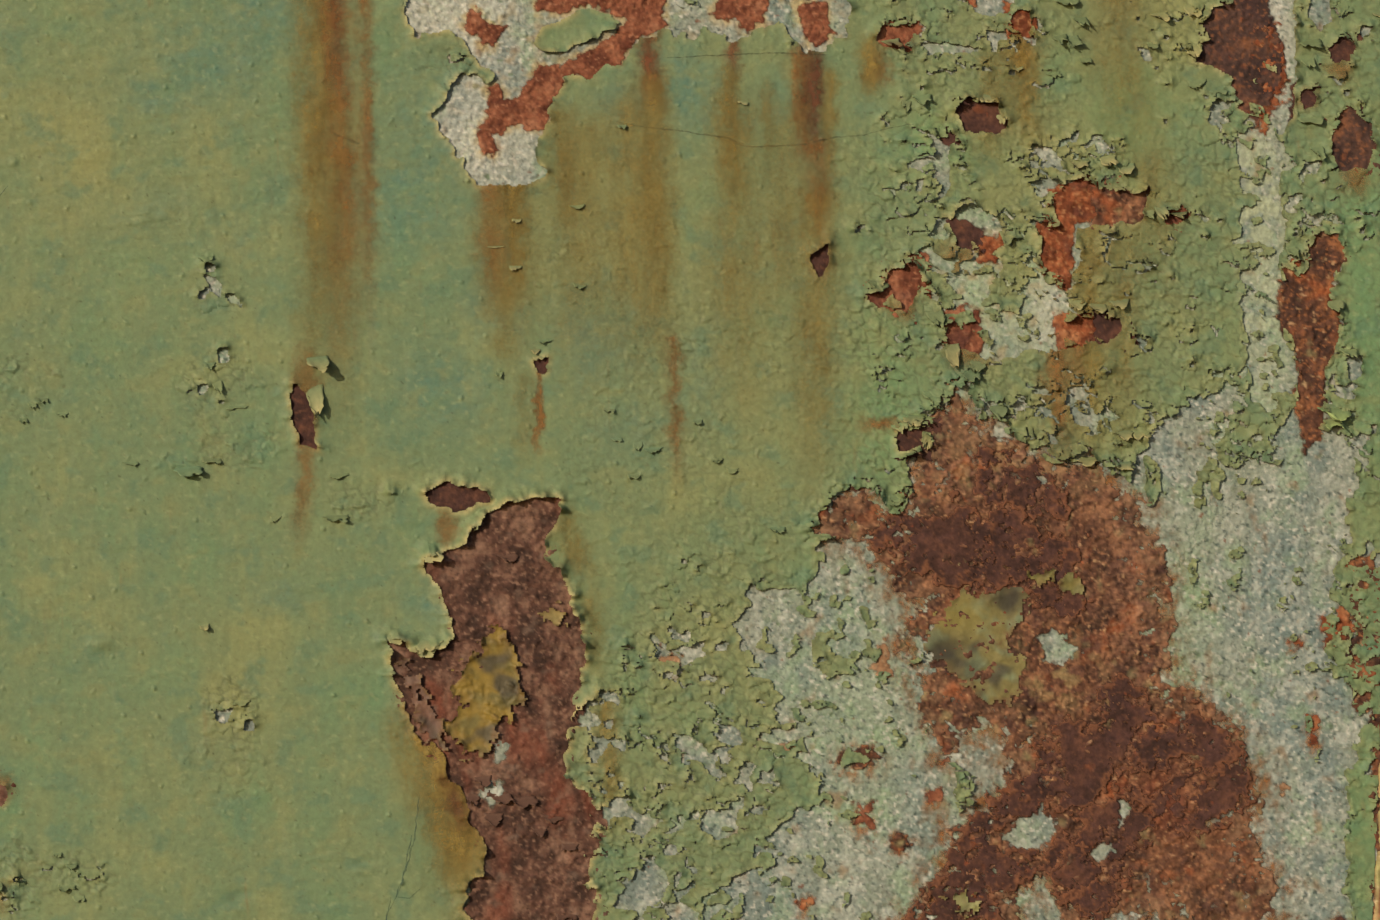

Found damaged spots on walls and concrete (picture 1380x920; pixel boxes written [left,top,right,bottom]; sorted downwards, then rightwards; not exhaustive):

corrosion [792,50,835,226]
peeling [277,355,349,479]
corrosion [532,373,545,440]
peeling [377,0,1380,920]
corrosion [803,336,1291,920]
peeling [0,874,27,912]
corrosion [1372,764,1380,920]